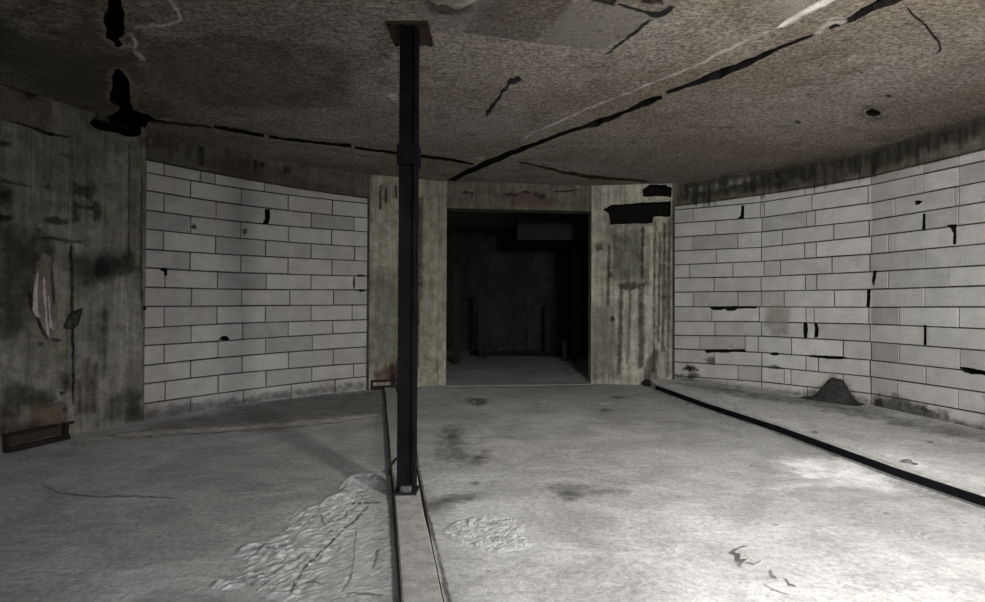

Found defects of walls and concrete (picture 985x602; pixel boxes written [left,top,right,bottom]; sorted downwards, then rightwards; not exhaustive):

crack [151,117,397,155]
water stain [523,0,834,140]
crack [421,0,942,183]
peeling [29,253,83,340]